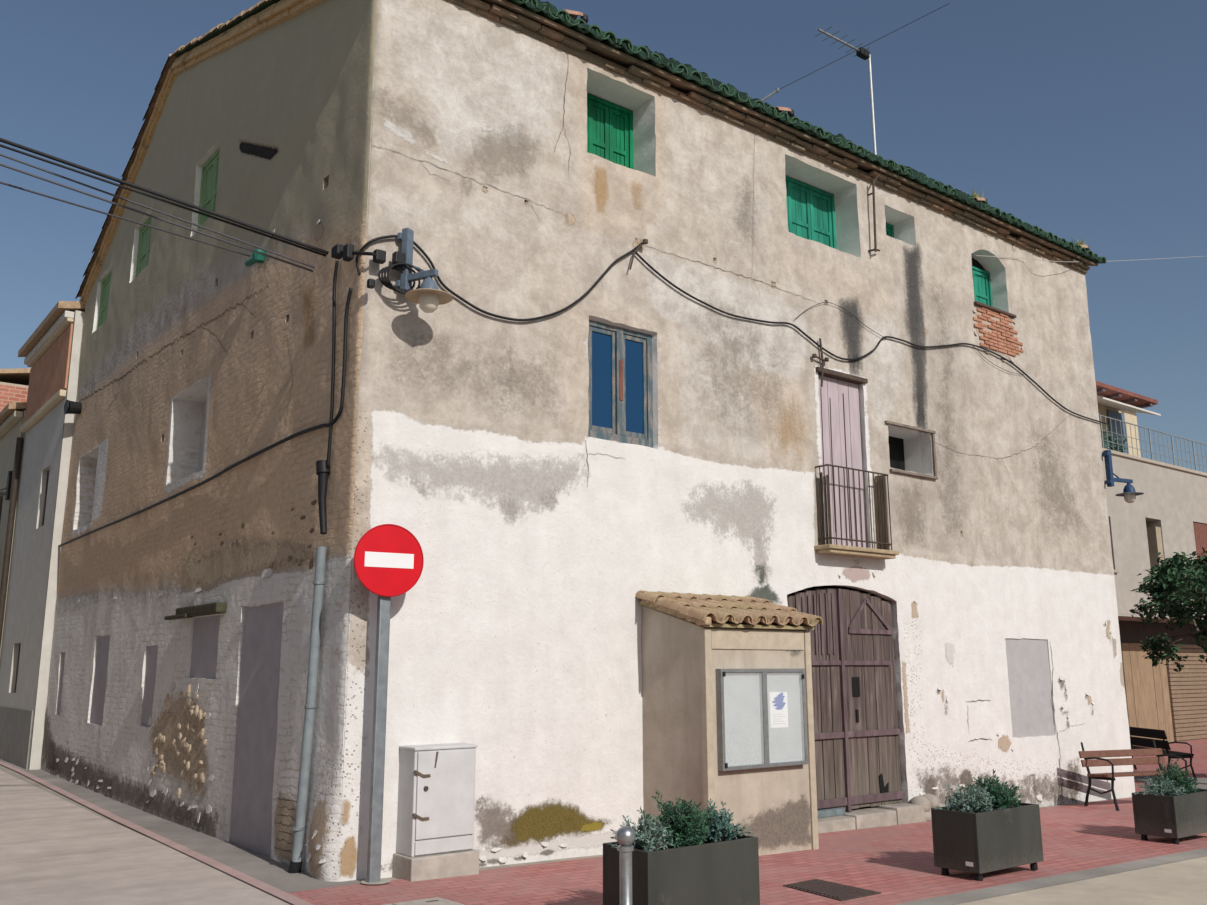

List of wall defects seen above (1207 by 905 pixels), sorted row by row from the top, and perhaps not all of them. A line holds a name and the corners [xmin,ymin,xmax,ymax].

crack [554,52,571,172]
spalling [973,307,1025,363]
peeling [687,481,773,580]
flaking render [839,560,876,582]
flaking render [47,682,218,837]
water stain [1068,760,1082,796]
mould [476,799,516,847]
flaking render [341,838,357,876]